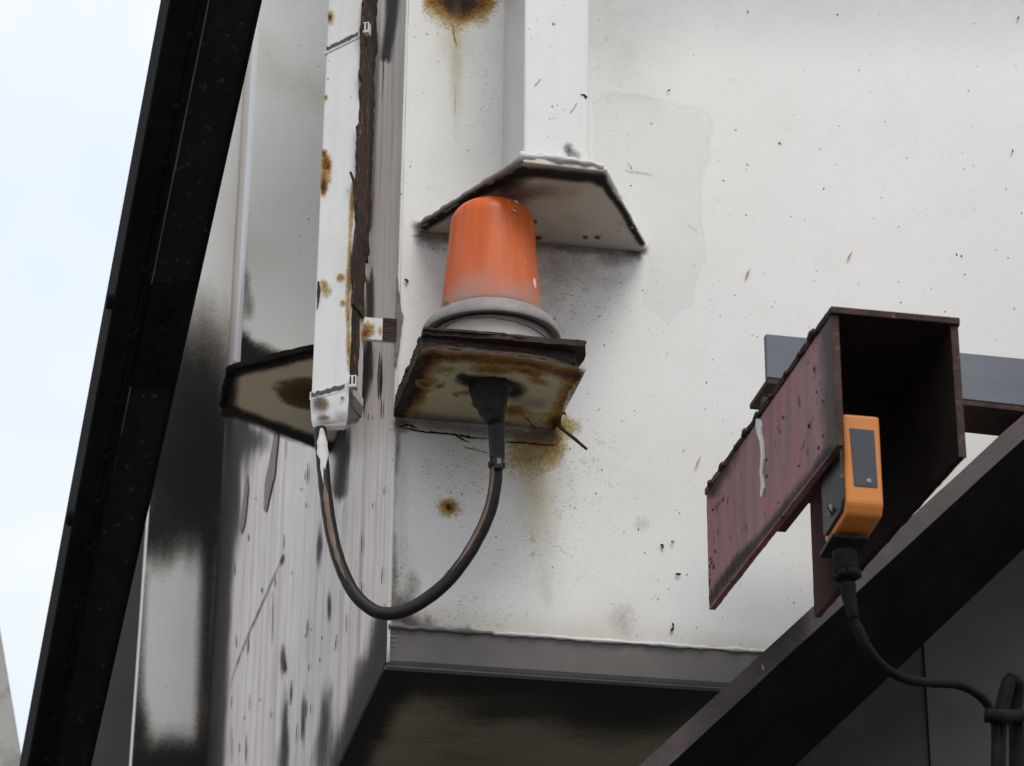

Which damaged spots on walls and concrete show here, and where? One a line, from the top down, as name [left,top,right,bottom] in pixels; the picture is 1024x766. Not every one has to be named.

corrosion [423,0,497,47]
corrosion [320,149,332,197]
corrosion [321,183,381,371]
corrosion [393,327,587,474]
crack [399,415,556,453]
corrosion [437,498,461,516]